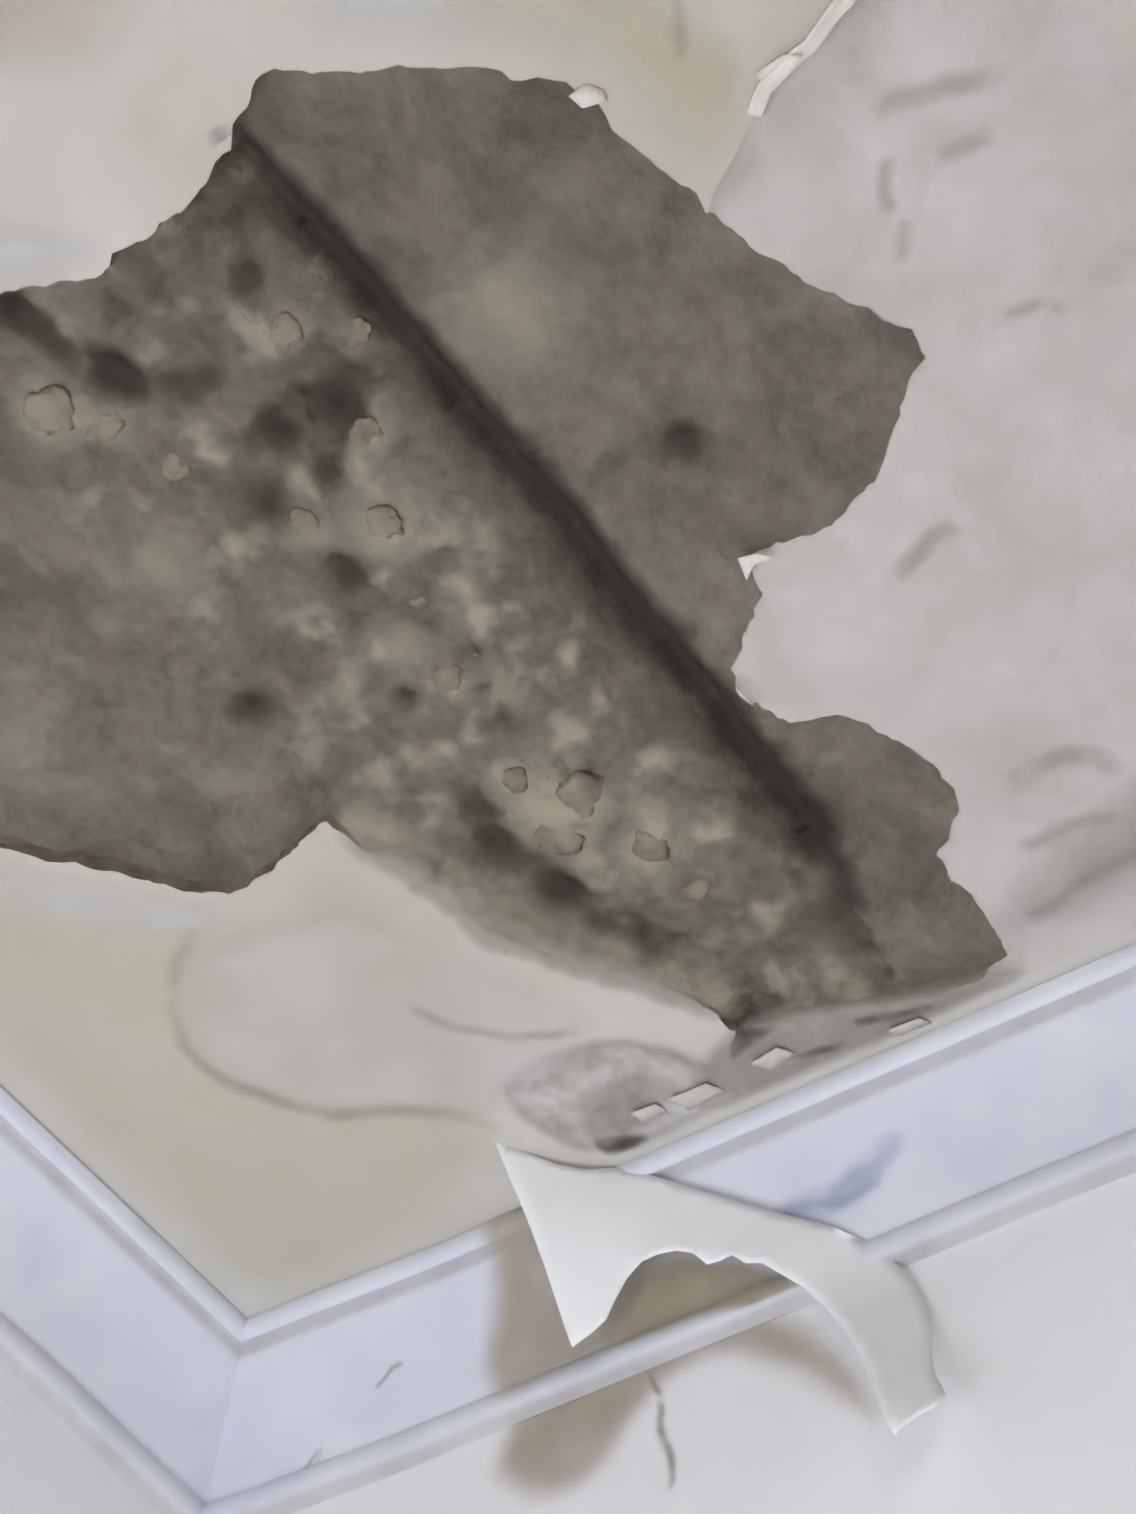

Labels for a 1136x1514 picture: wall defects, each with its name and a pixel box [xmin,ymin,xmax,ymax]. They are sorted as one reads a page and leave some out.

flaking render [0,0,1136,1038]
peeling [631,1083,725,1122]
peeling [751,1047,794,1070]
peeling [496,1143,947,1435]